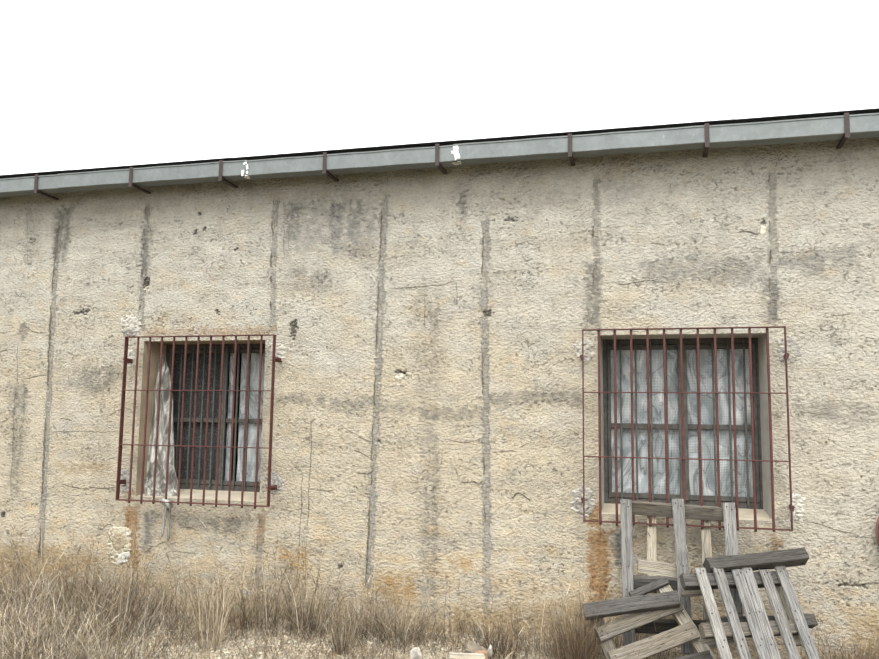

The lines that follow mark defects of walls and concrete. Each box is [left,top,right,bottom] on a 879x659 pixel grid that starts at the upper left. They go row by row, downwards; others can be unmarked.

peeling [106,526,133,568]
corrosion [588,507,609,601]